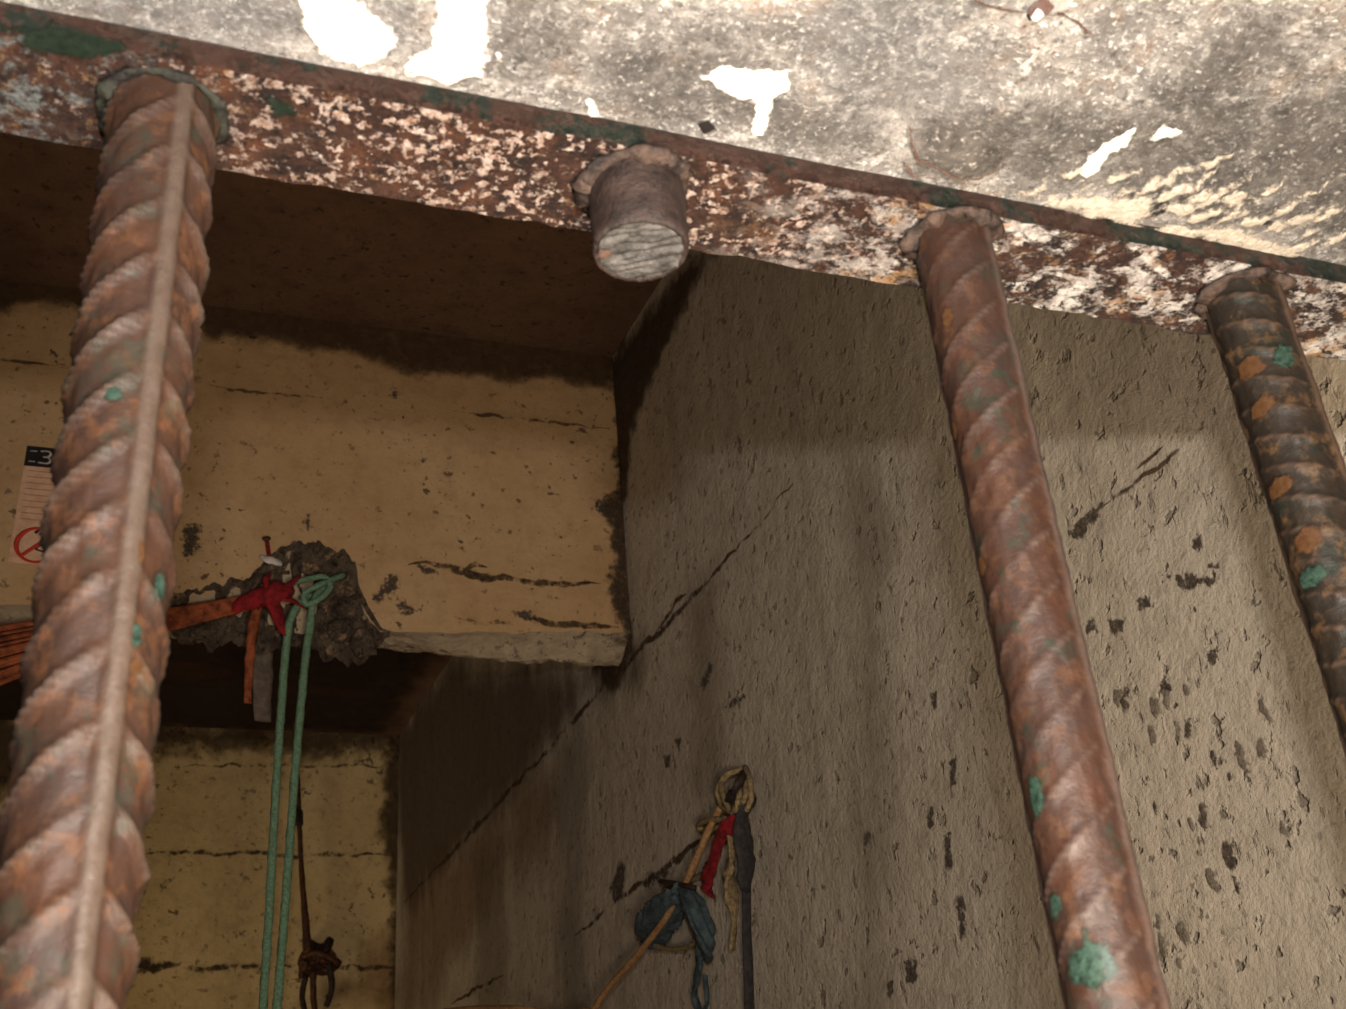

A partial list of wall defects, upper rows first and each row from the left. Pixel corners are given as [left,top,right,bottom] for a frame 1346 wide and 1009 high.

peeling [404,0,502,85]
peeling [701,66,791,138]
flaking render [1014,126,1346,257]
rust [1238,355,1266,380]
rust [1252,395,1278,420]
crack [1104,427,1205,506]
rust [1269,475,1293,500]
rust [1294,526,1324,554]
spalling [169,514,418,668]
crack [406,484,793,900]
crack [575,834,712,935]
crack [452,975,504,1004]